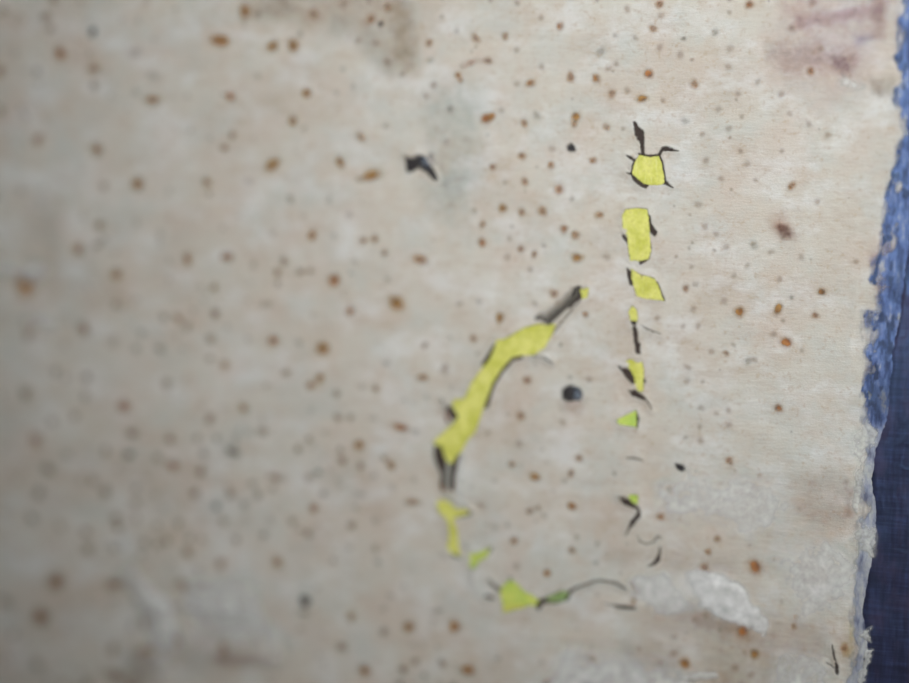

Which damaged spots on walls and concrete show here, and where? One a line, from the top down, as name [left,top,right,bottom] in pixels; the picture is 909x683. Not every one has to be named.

corrosion [211,36,228,46]
peeling [609,113,687,437]
peeling [425,278,597,567]
crack [618,449,651,468]
crack [631,528,669,574]
peeling [478,568,635,620]
crack [596,596,644,616]